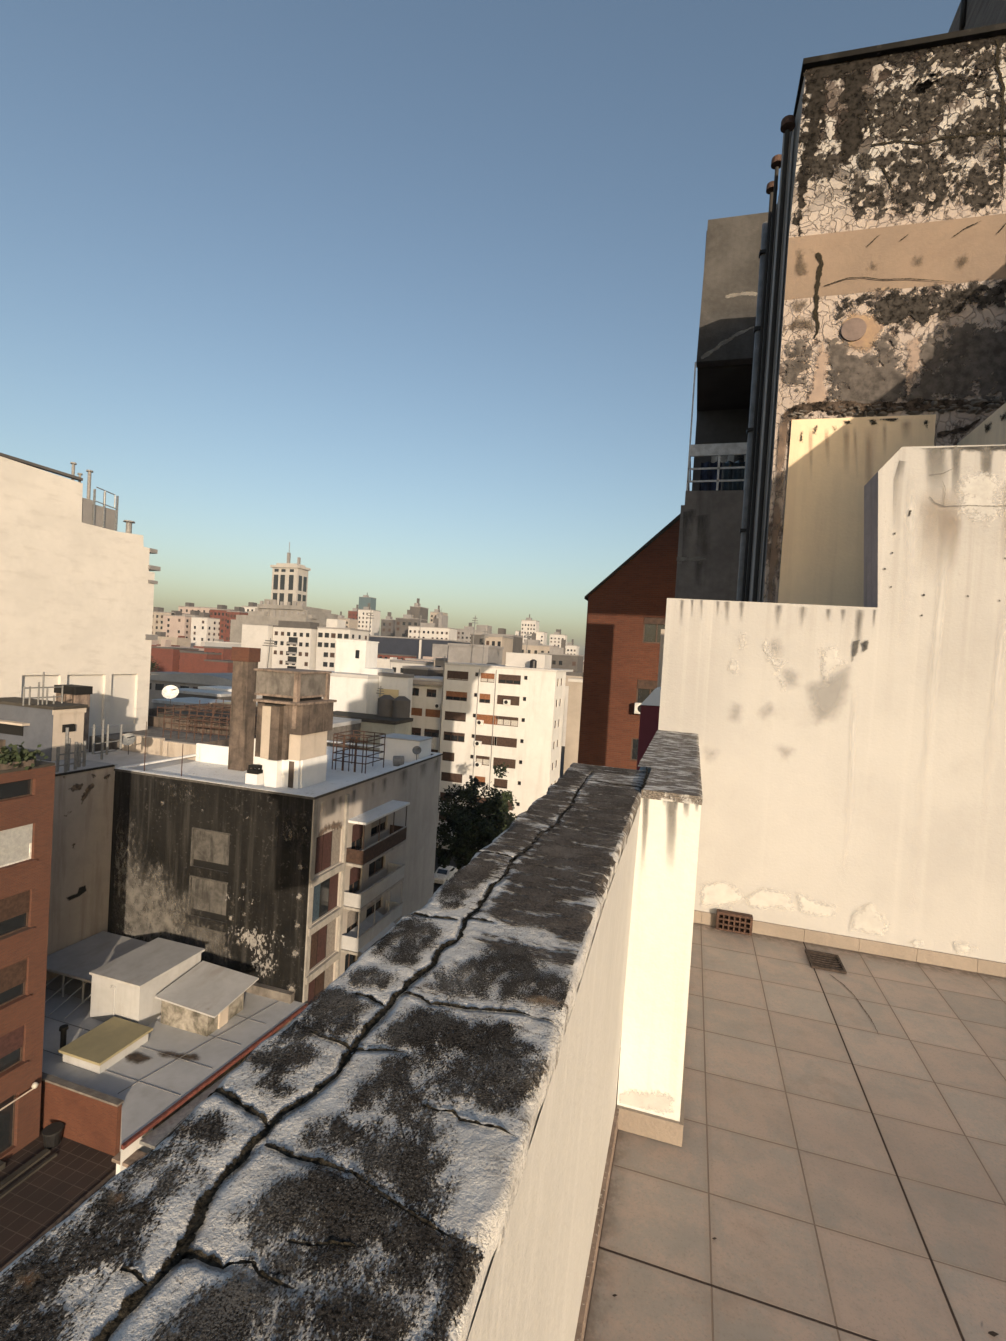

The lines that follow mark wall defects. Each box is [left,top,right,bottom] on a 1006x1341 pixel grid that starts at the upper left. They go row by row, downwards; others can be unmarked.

spalling [857,153,875,170]
crack [812,235,948,338]
peeling [784,320,1006,441]
damp [767,416,793,602]
damp [928,445,1006,476]
damp [853,640,869,657]
damp [125,1052,198,1064]
crack [90,767,649,1341]